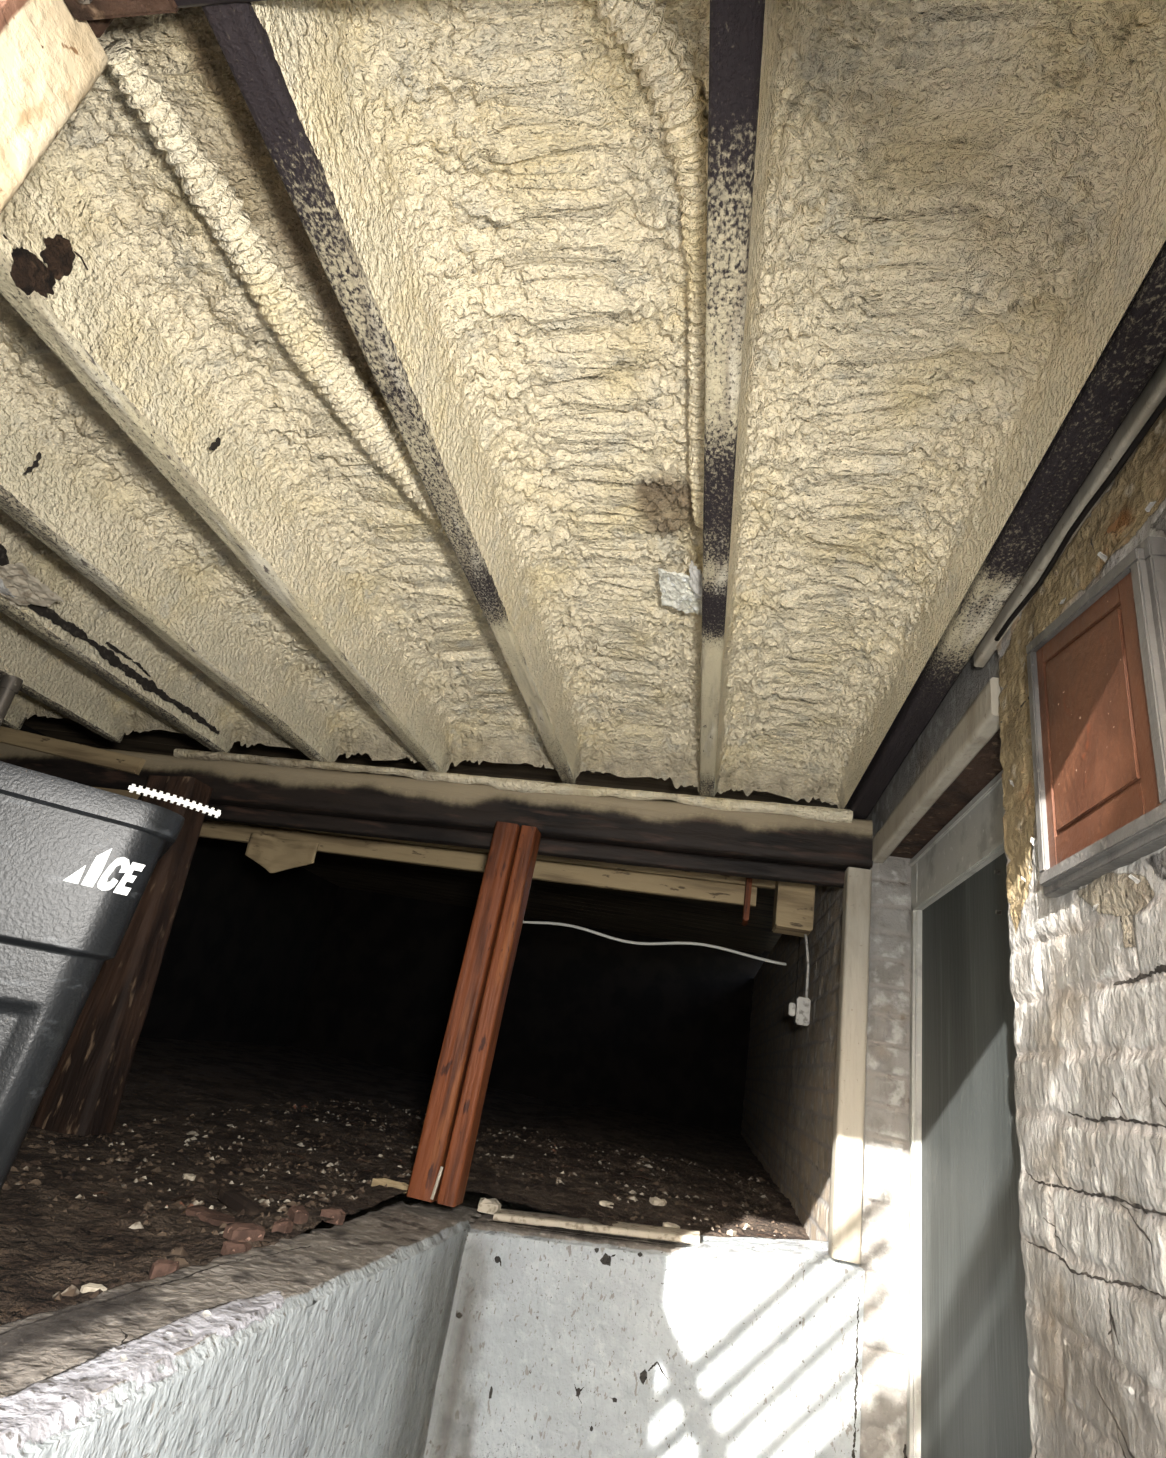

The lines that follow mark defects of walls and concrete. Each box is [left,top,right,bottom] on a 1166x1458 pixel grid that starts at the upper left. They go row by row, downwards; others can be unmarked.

crack [1113,964,1166,986]
crack [1068,1092,1166,1128]
peeling [0,1097,426,1265]
peeling [472,1126,793,1237]
peeling [52,1263,140,1300]
crack [1025,1165,1166,1344]
peeling [0,1291,284,1455]
crack [1096,1386,1135,1458]